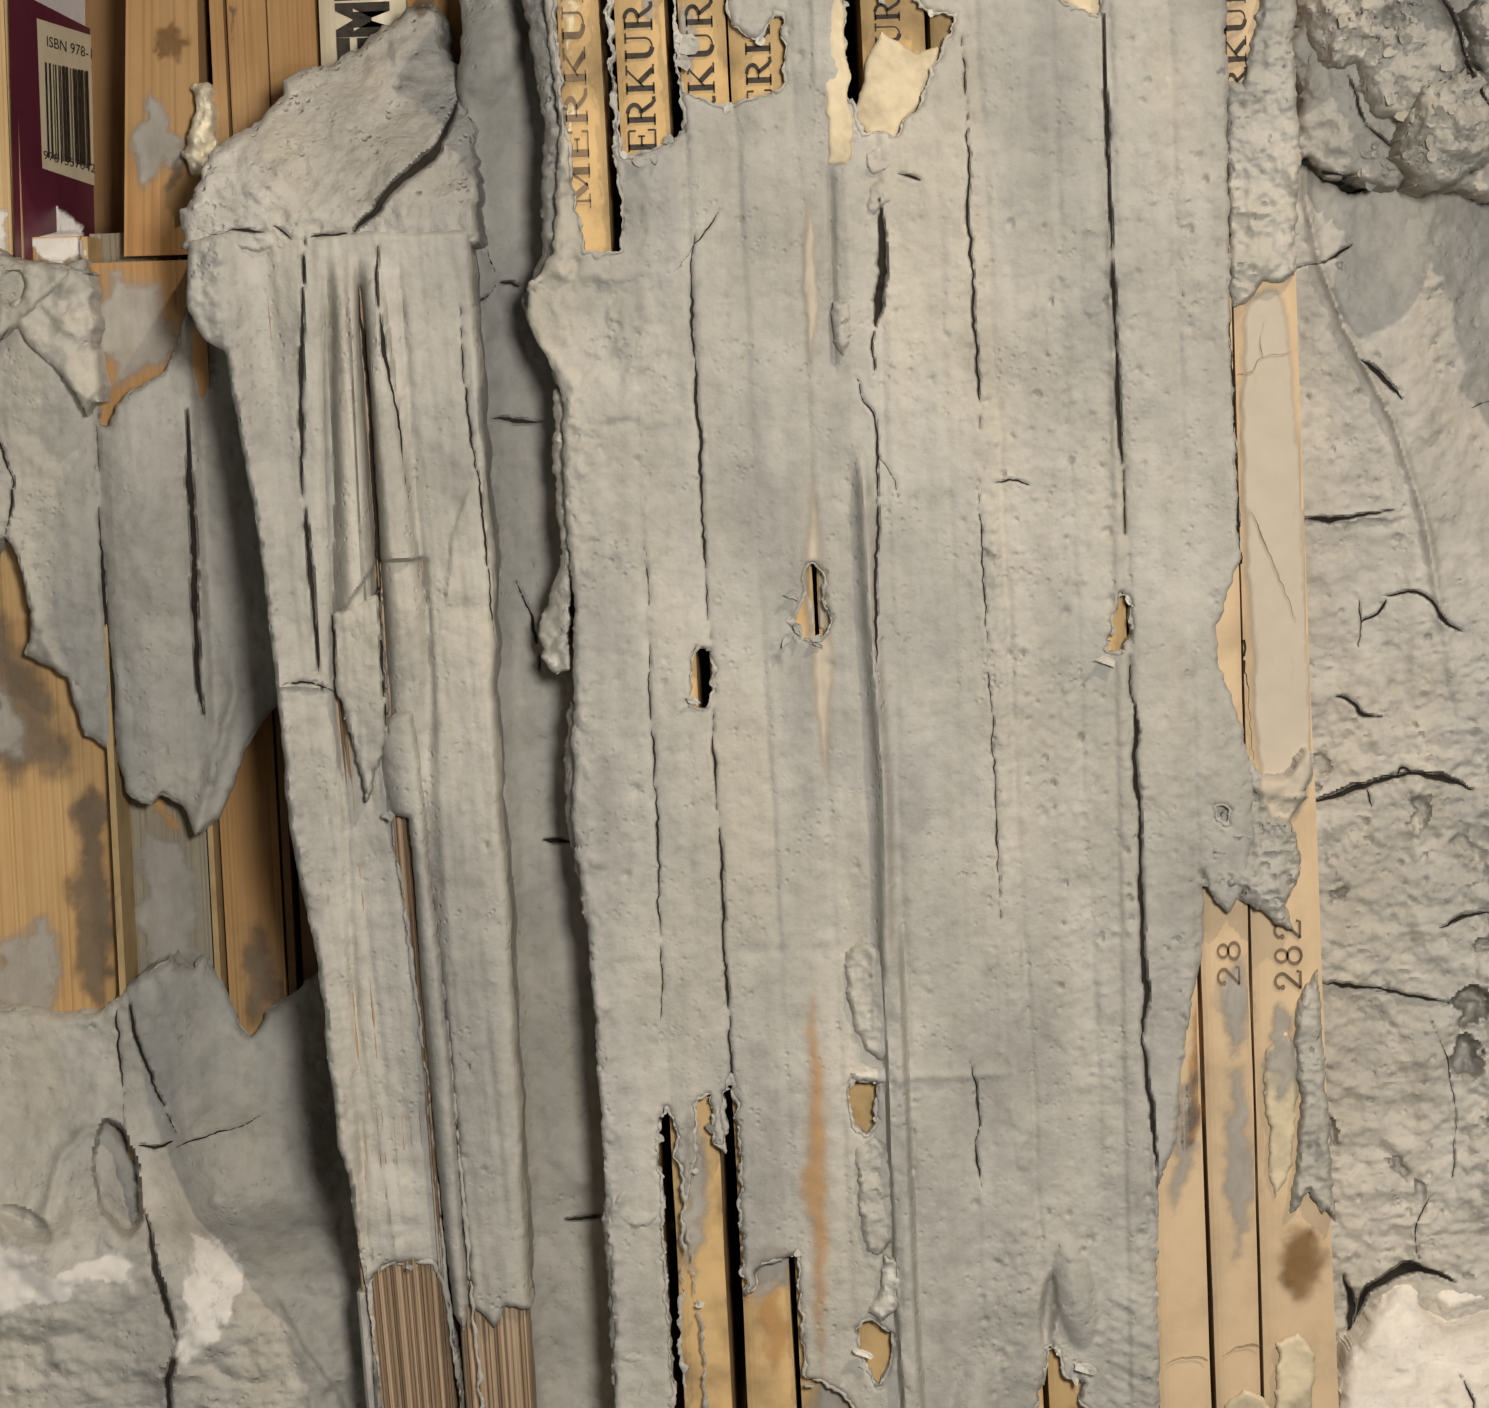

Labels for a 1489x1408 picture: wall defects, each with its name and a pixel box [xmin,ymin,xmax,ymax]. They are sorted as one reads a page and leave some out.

crack [198,97,459,732]
spalling [551,0,788,260]
crack [858,208,899,673]
crack [961,40,980,400]
crack [1103,15,1126,534]
spalling [686,641,718,710]
spalling [382,807,436,1147]
spalling [367,983,484,1408]
spalling [655,1073,855,1408]
spalling [853,1318,896,1391]
crack [1129,665,1157,1183]
crack [1324,982,1457,1330]